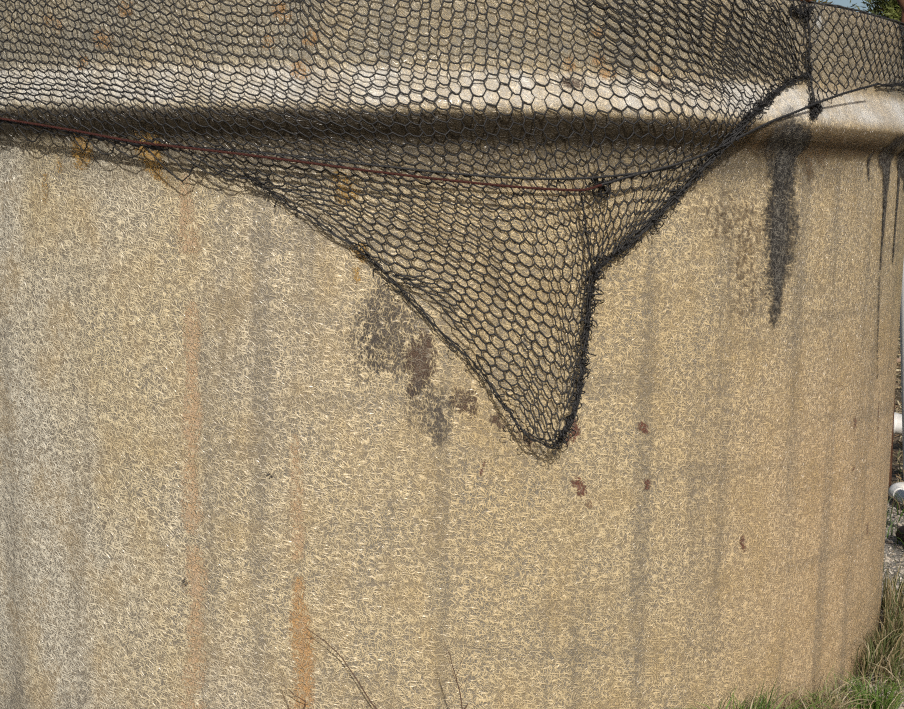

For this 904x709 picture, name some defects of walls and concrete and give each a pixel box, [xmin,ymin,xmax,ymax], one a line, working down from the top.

damp [695,108,904,325]
damp [403,329,478,445]
damp [489,414,536,447]
rust [177,301,208,709]
rust [289,577,315,709]